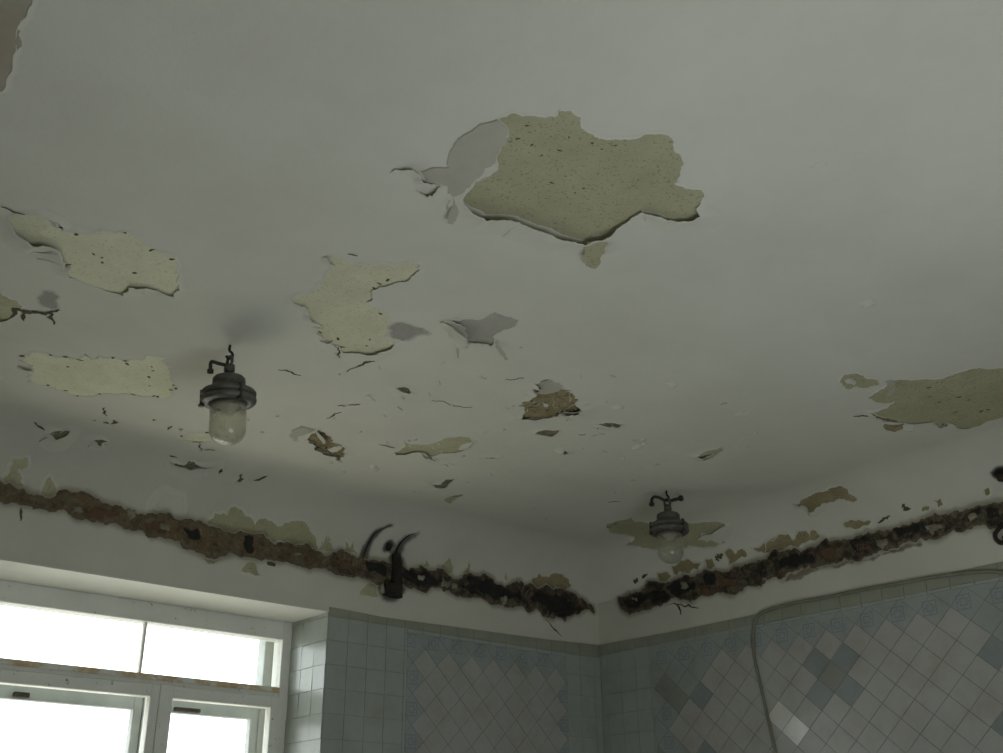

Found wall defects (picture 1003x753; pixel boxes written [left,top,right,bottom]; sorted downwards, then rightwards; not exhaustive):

peeling [0,0,39,94]
peeling [391,108,726,269]
peeling [0,207,191,302]
peeling [0,290,60,332]
peeling [284,254,428,361]
peeling [438,310,521,360]
peeling [145,426,239,517]
peeling [290,426,355,464]
peeling [509,377,627,438]
peeling [837,366,1003,433]
peeling [206,504,359,556]
peeling [603,484,859,584]